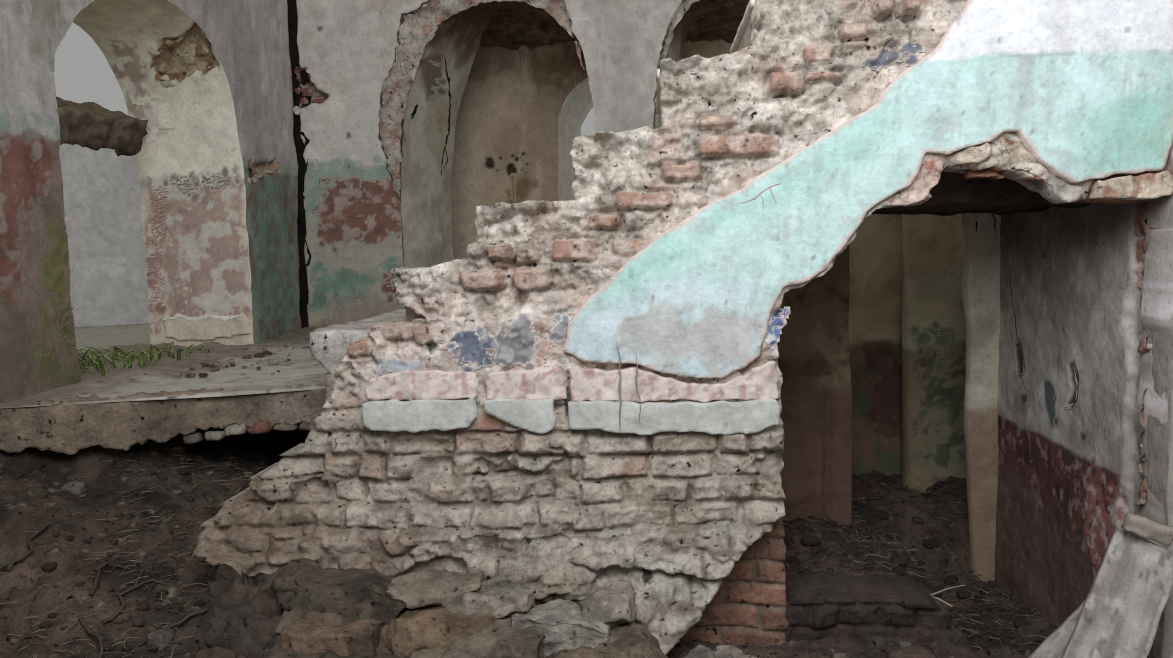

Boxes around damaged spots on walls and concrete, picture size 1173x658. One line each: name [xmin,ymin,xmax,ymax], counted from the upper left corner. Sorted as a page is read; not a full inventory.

peeling [0,99,60,306]
crack [287,0,312,328]
peeling [141,0,588,341]
peeling [362,0,1173,435]
peeling [858,320,966,483]
peeling [1079,389,1148,581]